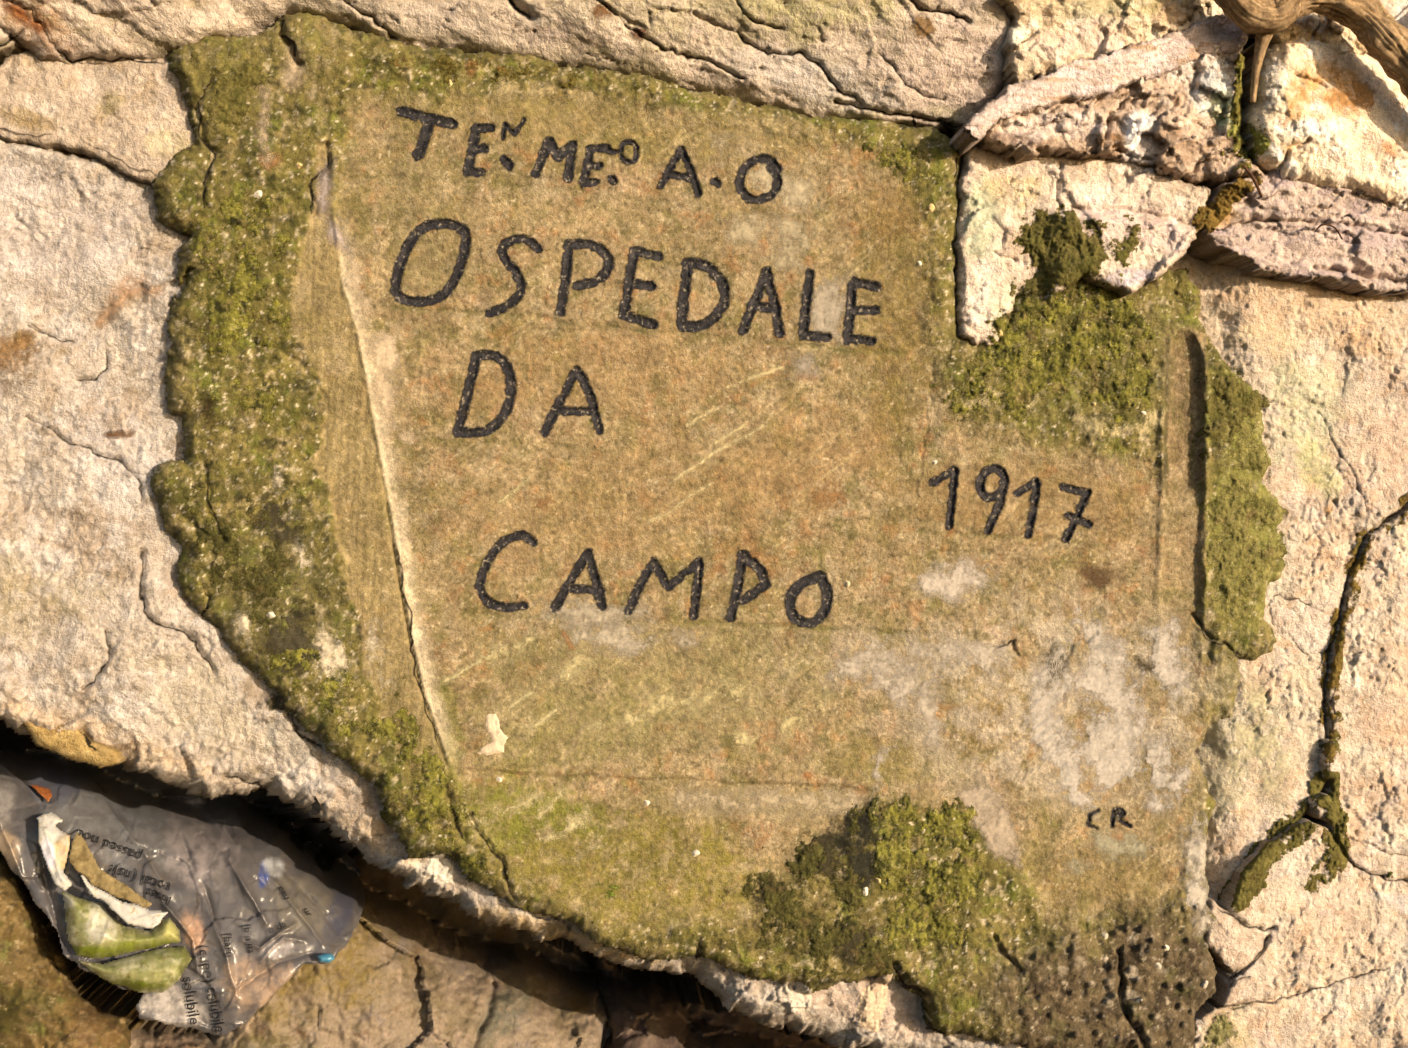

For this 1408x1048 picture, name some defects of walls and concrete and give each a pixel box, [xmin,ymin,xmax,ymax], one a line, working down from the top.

crack [509,0,530,18]
crack [608,0,978,178]
leakage [918,560,988,603]
leakage [1082,565,1109,589]
leakage [829,639,1009,746]
leakage [1024,608,1191,812]
crack [1319,643,1337,771]
leakage [872,749,889,779]
leakage [676,787,881,892]
leakage [959,784,1022,867]
leakage [1093,829,1147,861]
crack [1348,851,1408,883]